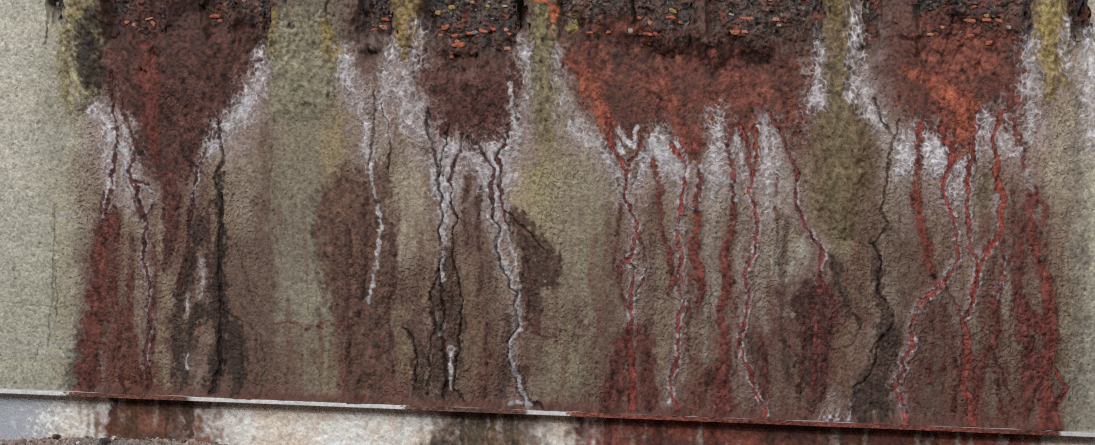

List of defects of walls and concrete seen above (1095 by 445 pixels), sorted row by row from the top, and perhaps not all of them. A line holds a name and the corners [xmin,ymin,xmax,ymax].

water stain [30,321,123,439]
rust [63,0,271,444]
crack [209,125,224,393]
water stain [169,0,607,445]
crack [404,112,464,399]
spalling [421,0,529,59]
rust [412,55,562,343]
spalling [558,0,825,63]
rust [561,2,1069,445]
crack [873,98,899,297]
water stain [890,0,1095,300]
spalling [1068,0,1093,42]